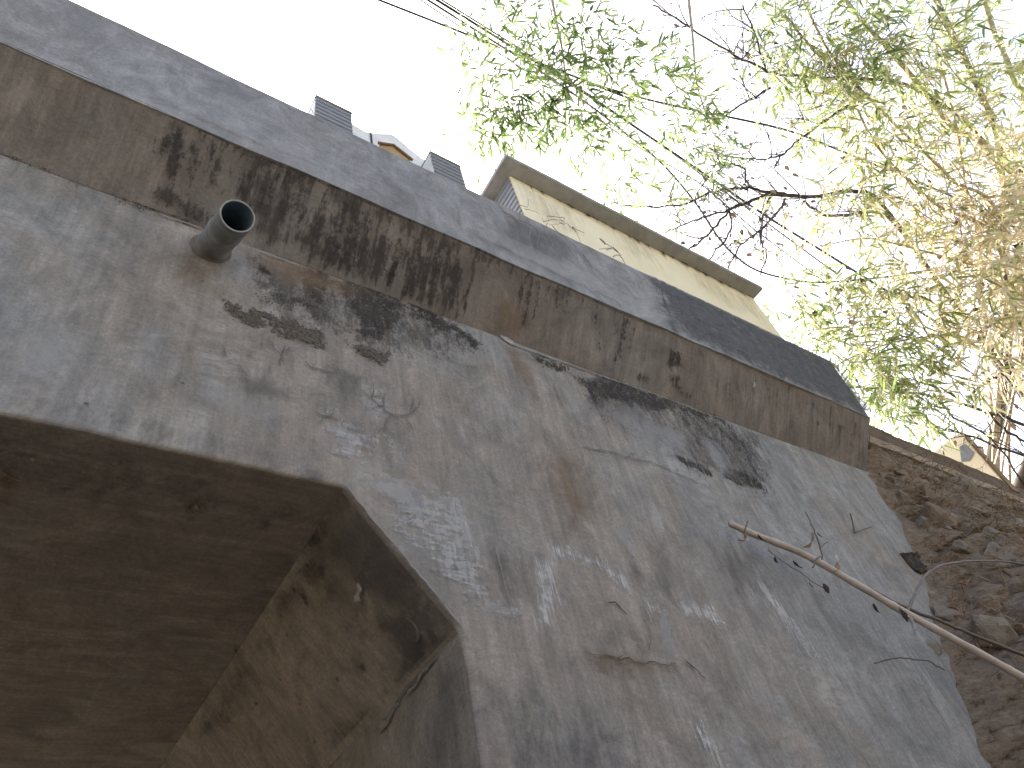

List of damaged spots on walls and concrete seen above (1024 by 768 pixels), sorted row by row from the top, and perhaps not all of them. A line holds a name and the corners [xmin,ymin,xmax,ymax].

damp [106,125,569,354]
crack [362,382,423,435]
damp [532,312,775,494]
crack [586,601,705,679]